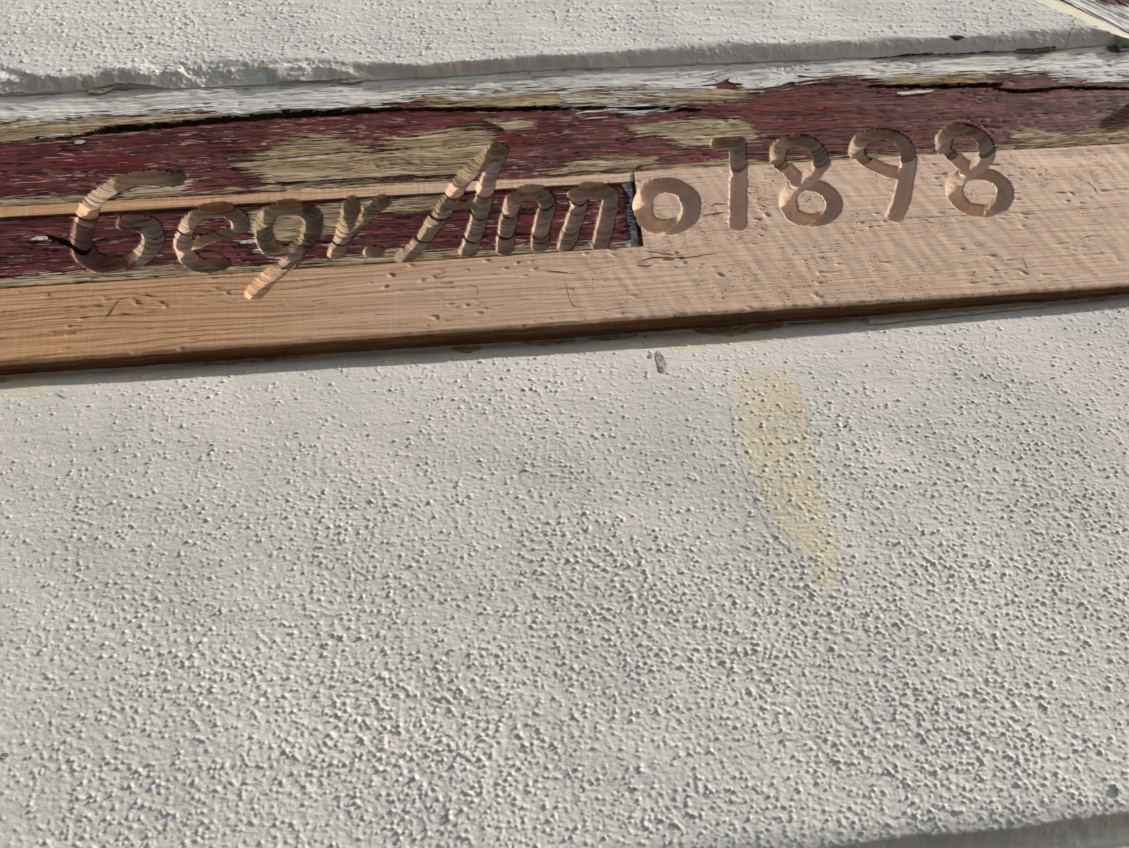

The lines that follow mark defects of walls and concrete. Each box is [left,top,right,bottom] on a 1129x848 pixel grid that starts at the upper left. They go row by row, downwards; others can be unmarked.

crack [35,105,702,140]
peeling [0,73,1129,323]
water stain [648,324,848,597]